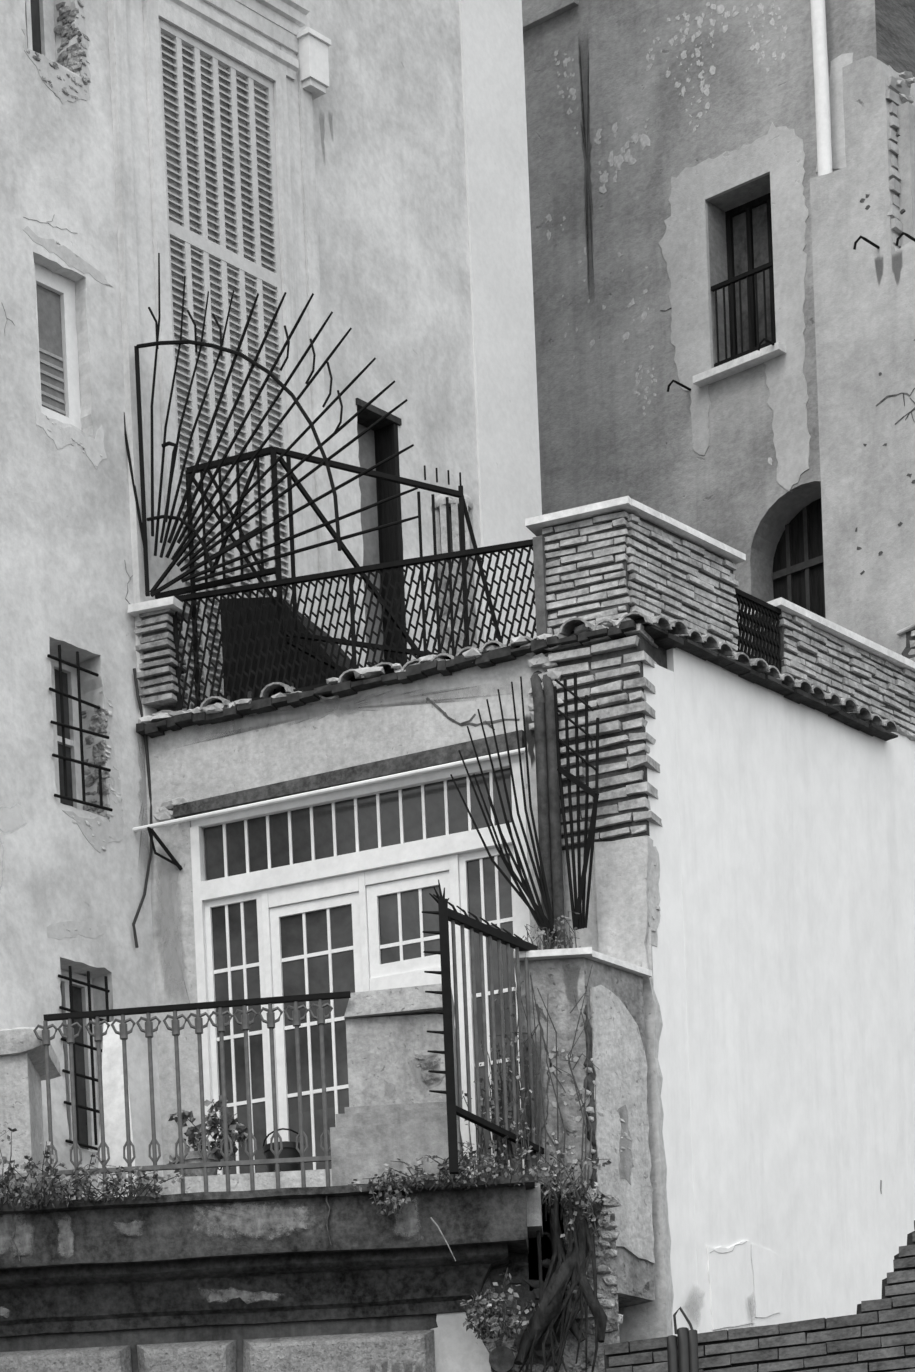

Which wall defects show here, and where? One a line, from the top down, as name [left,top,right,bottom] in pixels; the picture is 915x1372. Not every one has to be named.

spalling [22,0,91,104]
peeling [643,0,787,132]
damp [579,47,593,275]
spalling [886,71,915,253]
rust [875,254,902,282]
crack [876,388,915,425]
spalling [901,629,915,662]
spalling [62,677,124,853]
damp [0,1213,33,1255]
damp [57,1217,74,1257]
damp [194,1202,308,1240]
damp [207,1288,278,1303]